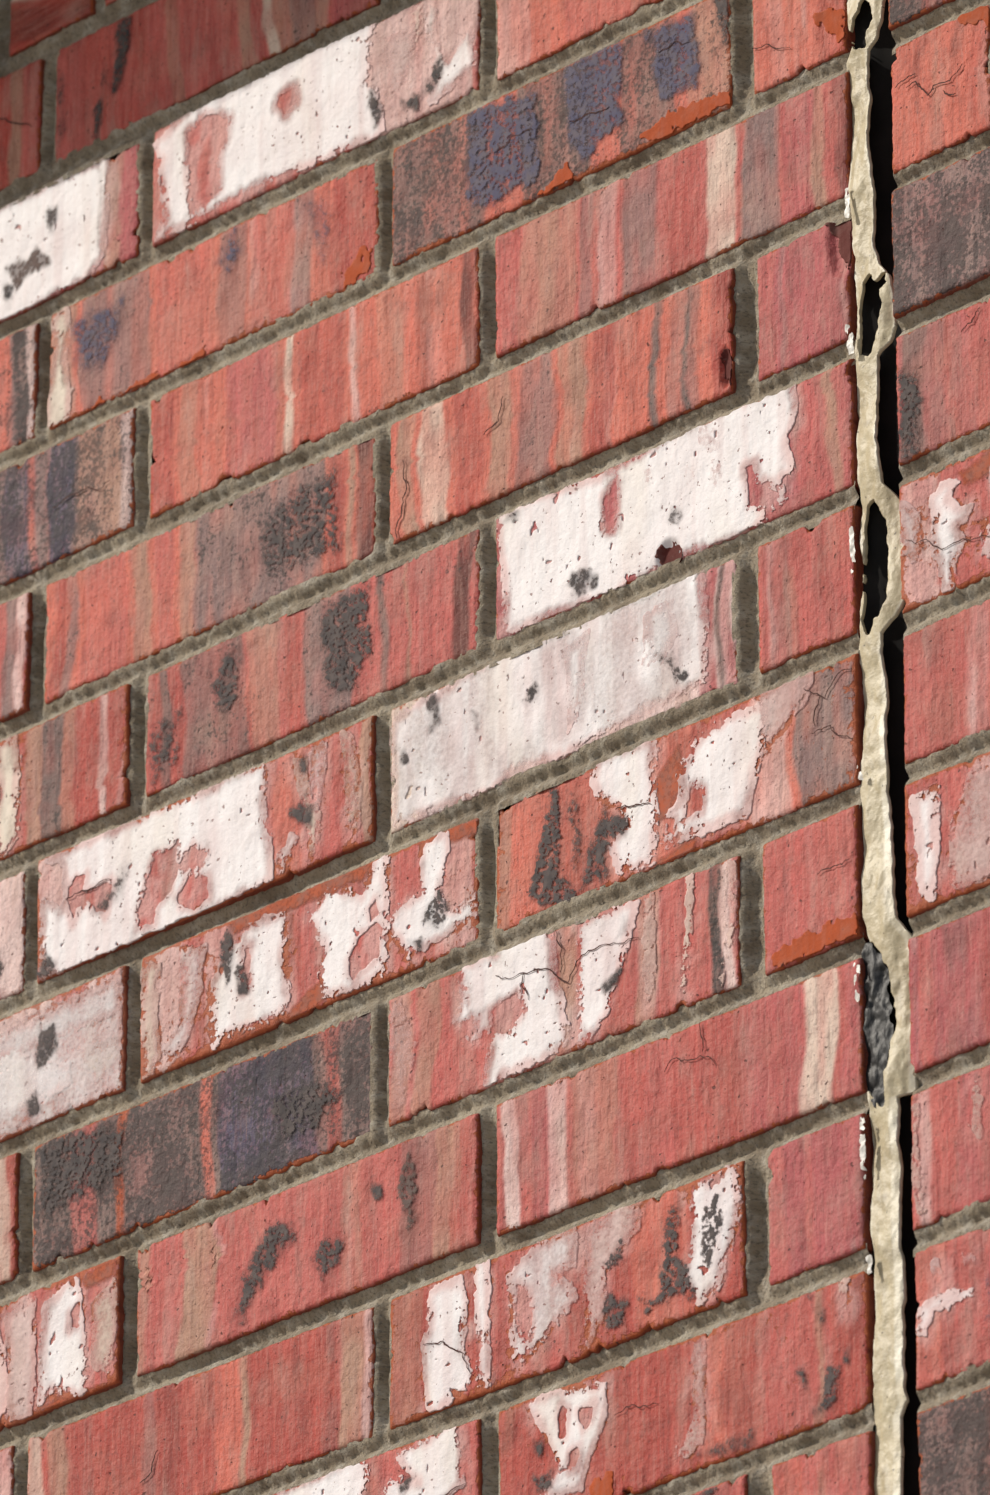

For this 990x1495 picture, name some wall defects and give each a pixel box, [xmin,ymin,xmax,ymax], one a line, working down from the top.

leakage [896,369,922,459]
leakage [569,568,598,596]
leakage [656,652,687,681]
leakage [426,695,440,732]
crack [804,0,989,1495]
leakage [288,803,312,824]
leakage [528,785,628,906]
leakage [97,878,122,910]
leakage [414,889,448,950]
leakage [36,952,54,977]
leakage [219,931,248,994]
leakage [602,968,622,992]